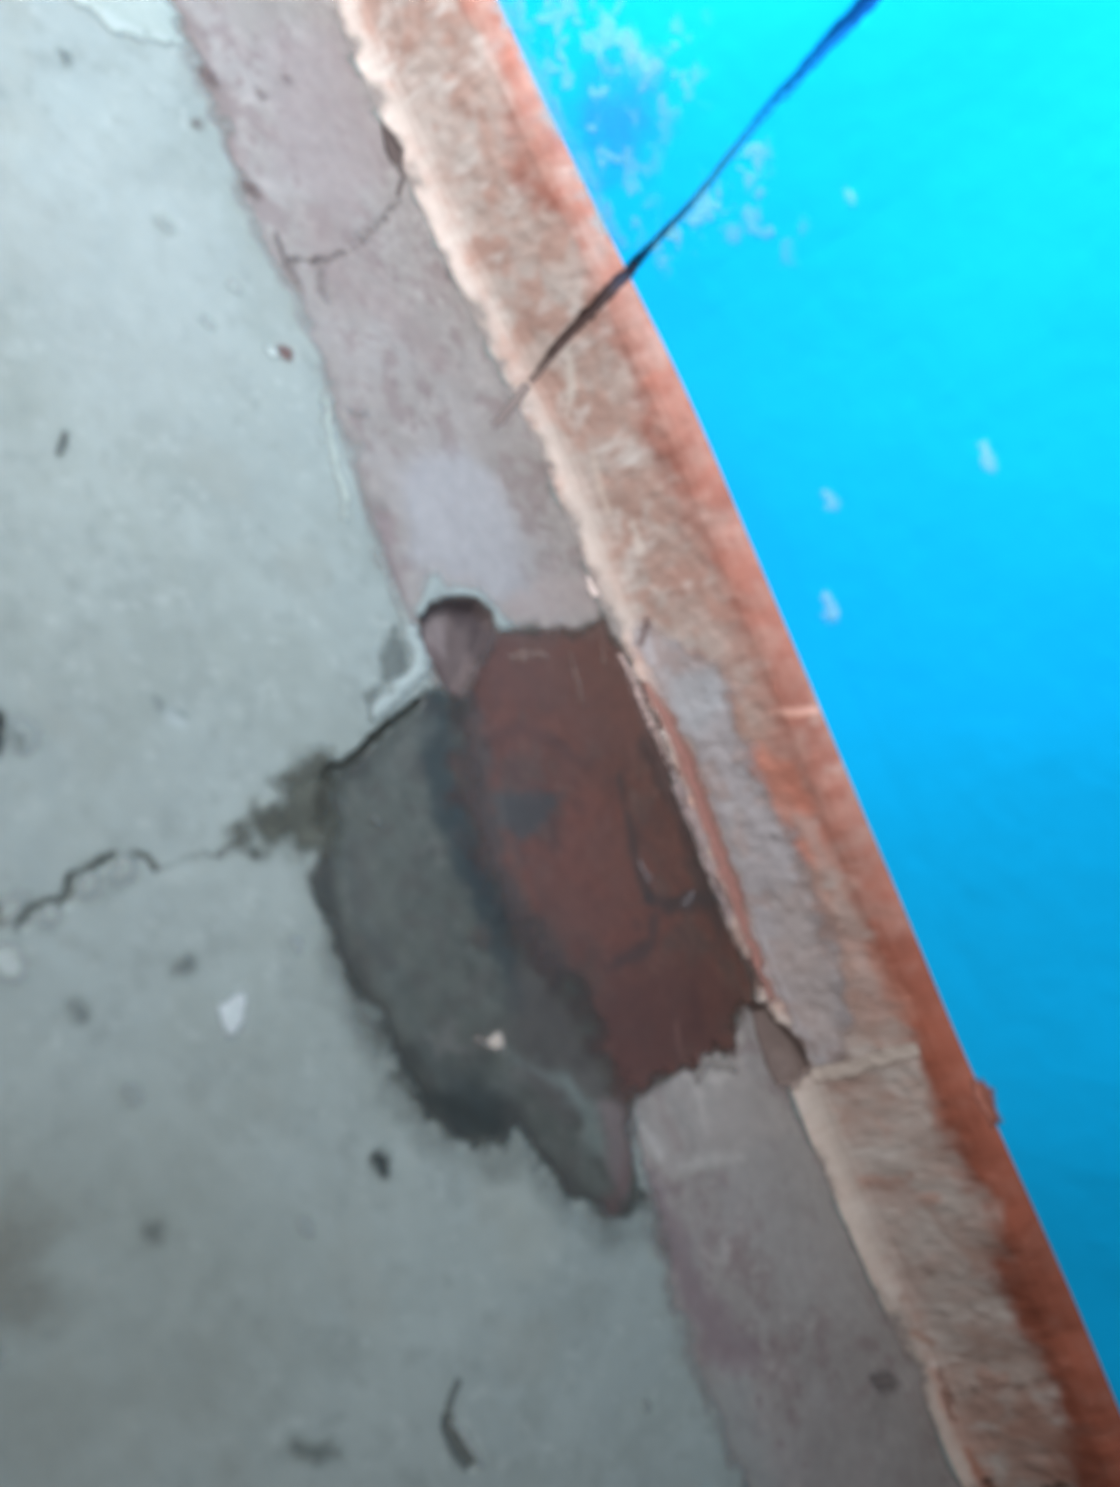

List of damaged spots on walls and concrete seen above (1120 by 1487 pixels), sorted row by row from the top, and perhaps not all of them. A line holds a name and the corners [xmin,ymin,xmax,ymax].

peeling [531,0,660,129]
crack [276,206,395,286]
peeling [381,120,405,197]
crack [491,0,879,429]
peeling [667,190,720,240]
peeling [727,144,774,238]
peeling [587,577,598,596]
damp [225,753,340,859]
crack [0,851,156,925]
spalling [308,617,852,1219]
spalling [442,1379,483,1471]